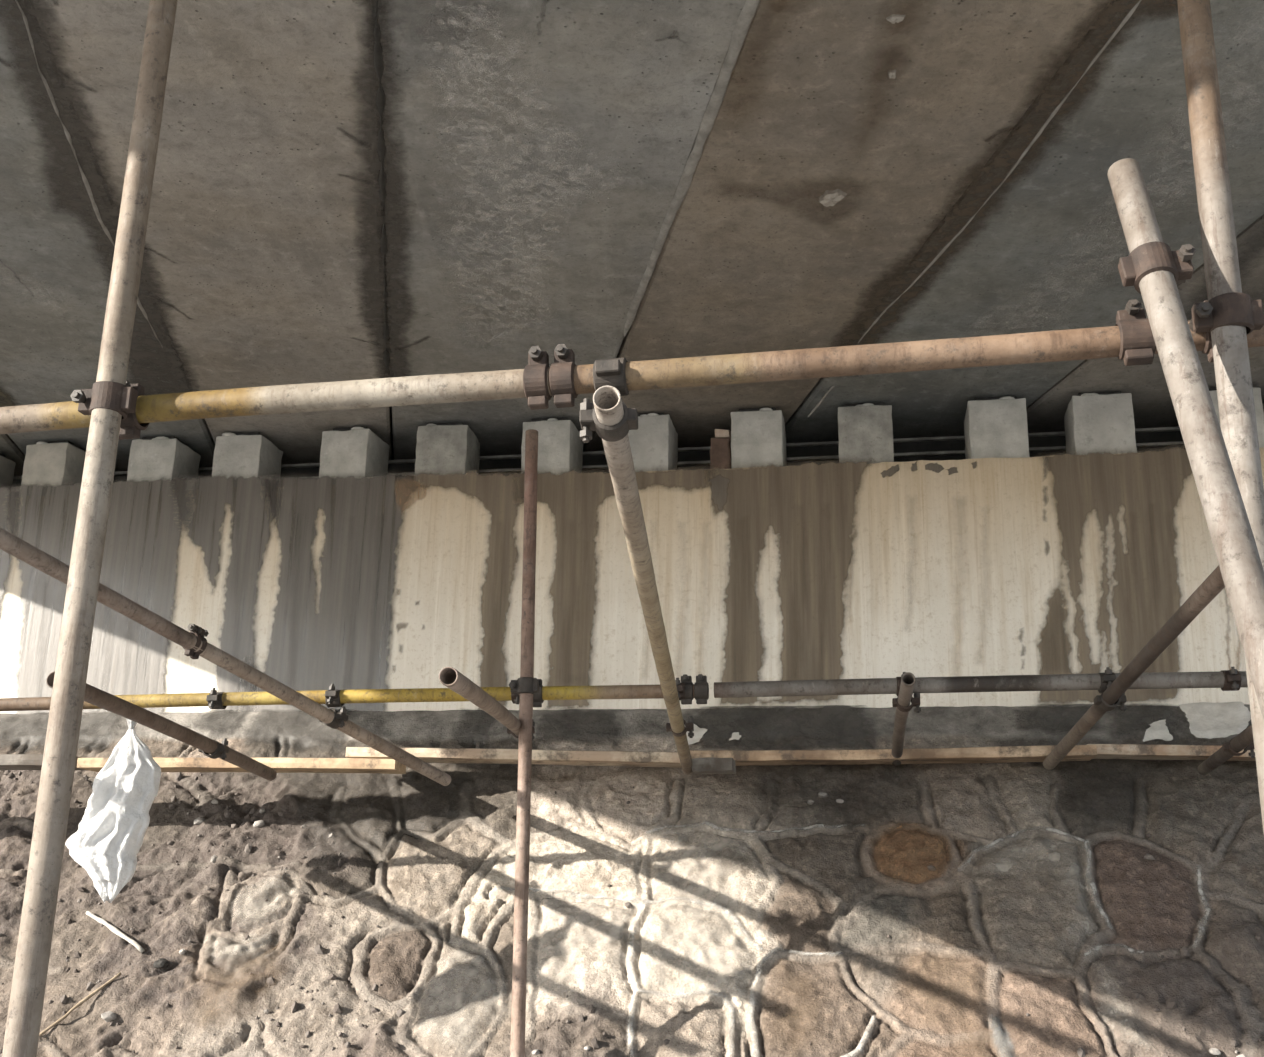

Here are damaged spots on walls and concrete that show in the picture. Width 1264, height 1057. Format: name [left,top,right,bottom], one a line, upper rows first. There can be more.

water stain [0,0,121,274]
water stain [339,0,429,378]
spalling [776,185,847,217]
water stain [835,0,1178,347]
water stain [0,549,67,752]
water stain [0,483,81,566]
water stain [86,601,170,713]
water stain [99,470,618,749]
water stain [635,461,869,682]
water stain [694,695,871,750]
water stain [1018,689,1181,735]
water stain [1019,447,1193,675]